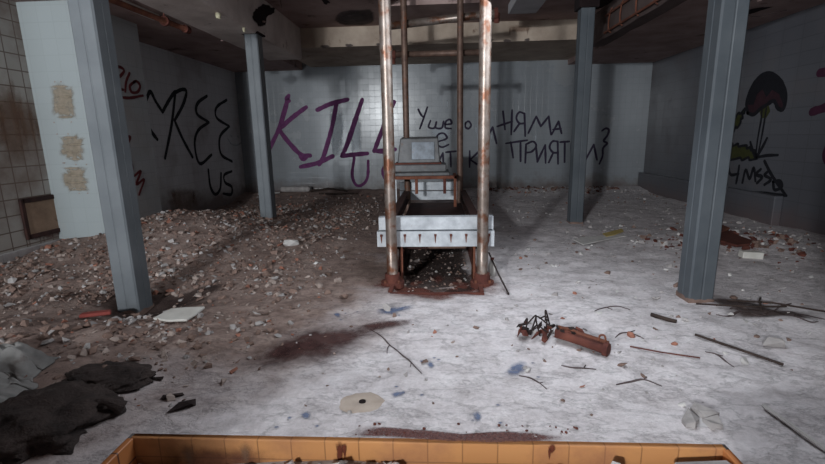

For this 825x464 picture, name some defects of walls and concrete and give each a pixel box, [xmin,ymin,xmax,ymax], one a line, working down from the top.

peeling [53,81,74,123]
peeling [56,133,88,194]
corrosion [397,283,495,299]